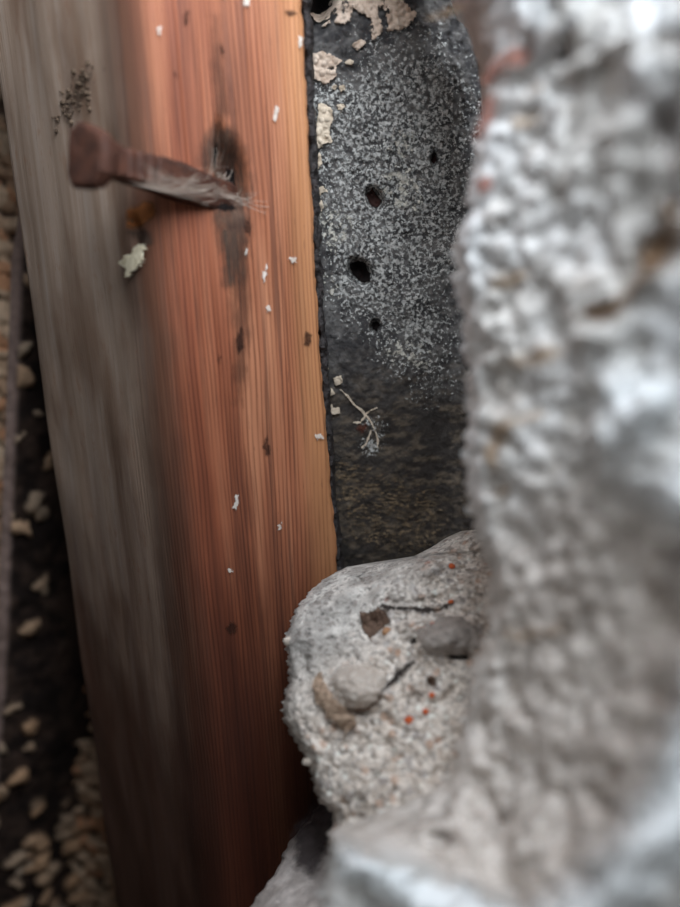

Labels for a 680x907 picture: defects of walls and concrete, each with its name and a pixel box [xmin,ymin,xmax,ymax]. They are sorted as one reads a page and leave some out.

flaking render [311,0,417,50]
peeling [313,51,354,91]
peeling [316,103,345,169]
peeling [328,368,343,415]
crack [379,600,454,614]
crack [348,638,436,713]